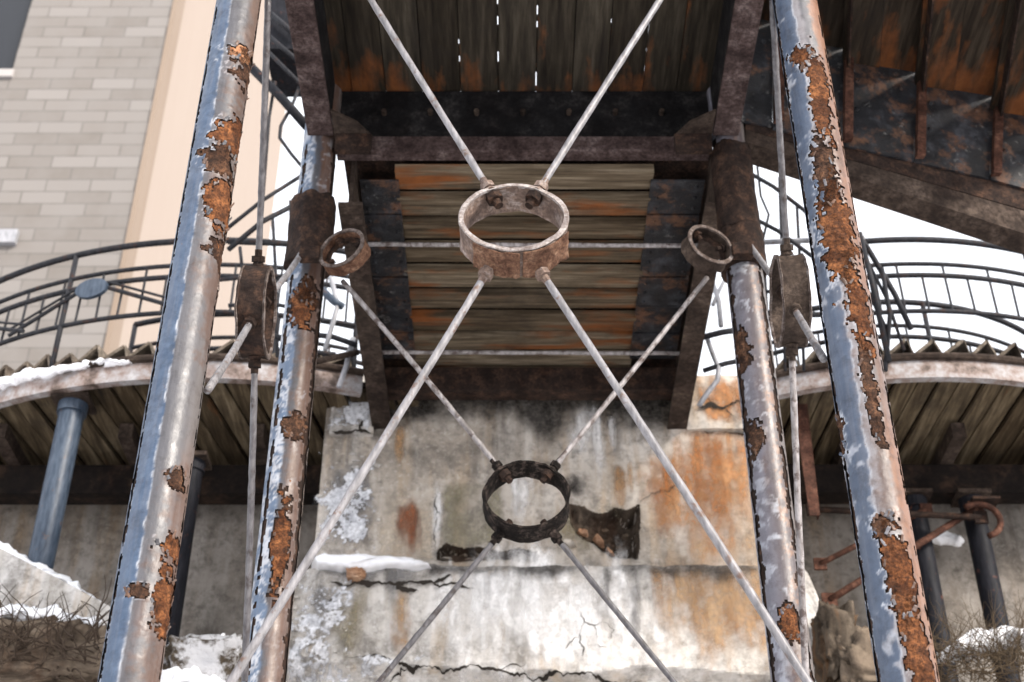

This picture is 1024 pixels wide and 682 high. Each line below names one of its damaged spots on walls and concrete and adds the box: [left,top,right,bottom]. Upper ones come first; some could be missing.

damp [577,413,613,454]
rust [399,503,417,545]
spalling [437,542,536,562]
spalling [563,504,641,560]
rust [653,433,766,654]
crack [328,574,472,602]
crack [344,611,640,682]